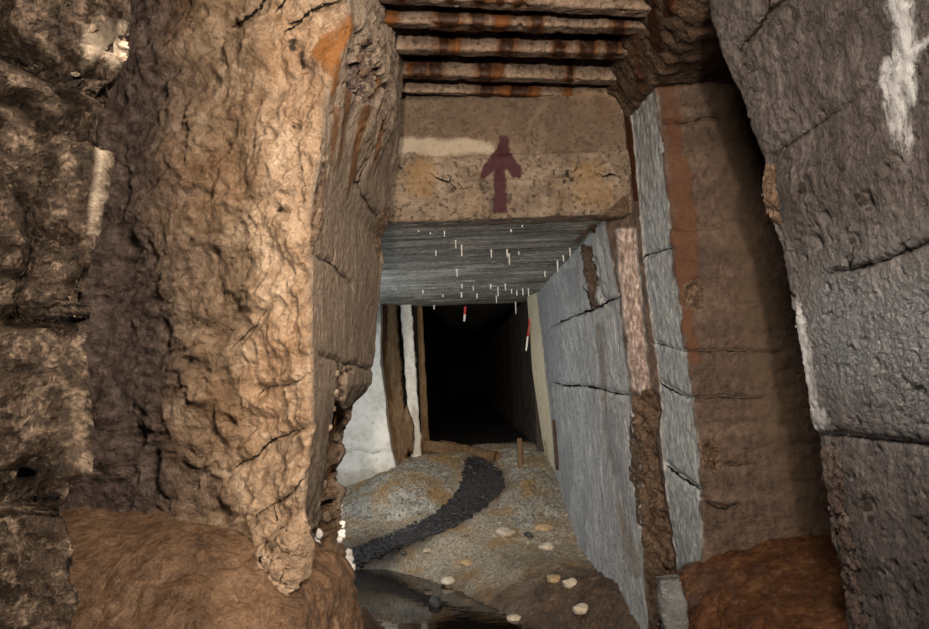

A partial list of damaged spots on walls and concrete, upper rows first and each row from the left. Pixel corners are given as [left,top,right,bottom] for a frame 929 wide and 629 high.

crack [231,0,341,32]
rust [384,0,407,28]
rust [646,0,676,52]
rust [314,16,353,96]
rust [407,0,543,98]
rust [550,16,638,97]
crack [826,242,928,274]
crack [548,288,622,328]
crack [554,382,628,395]
crack [228,427,308,472]
crack [822,434,929,445]
crack [256,476,306,521]